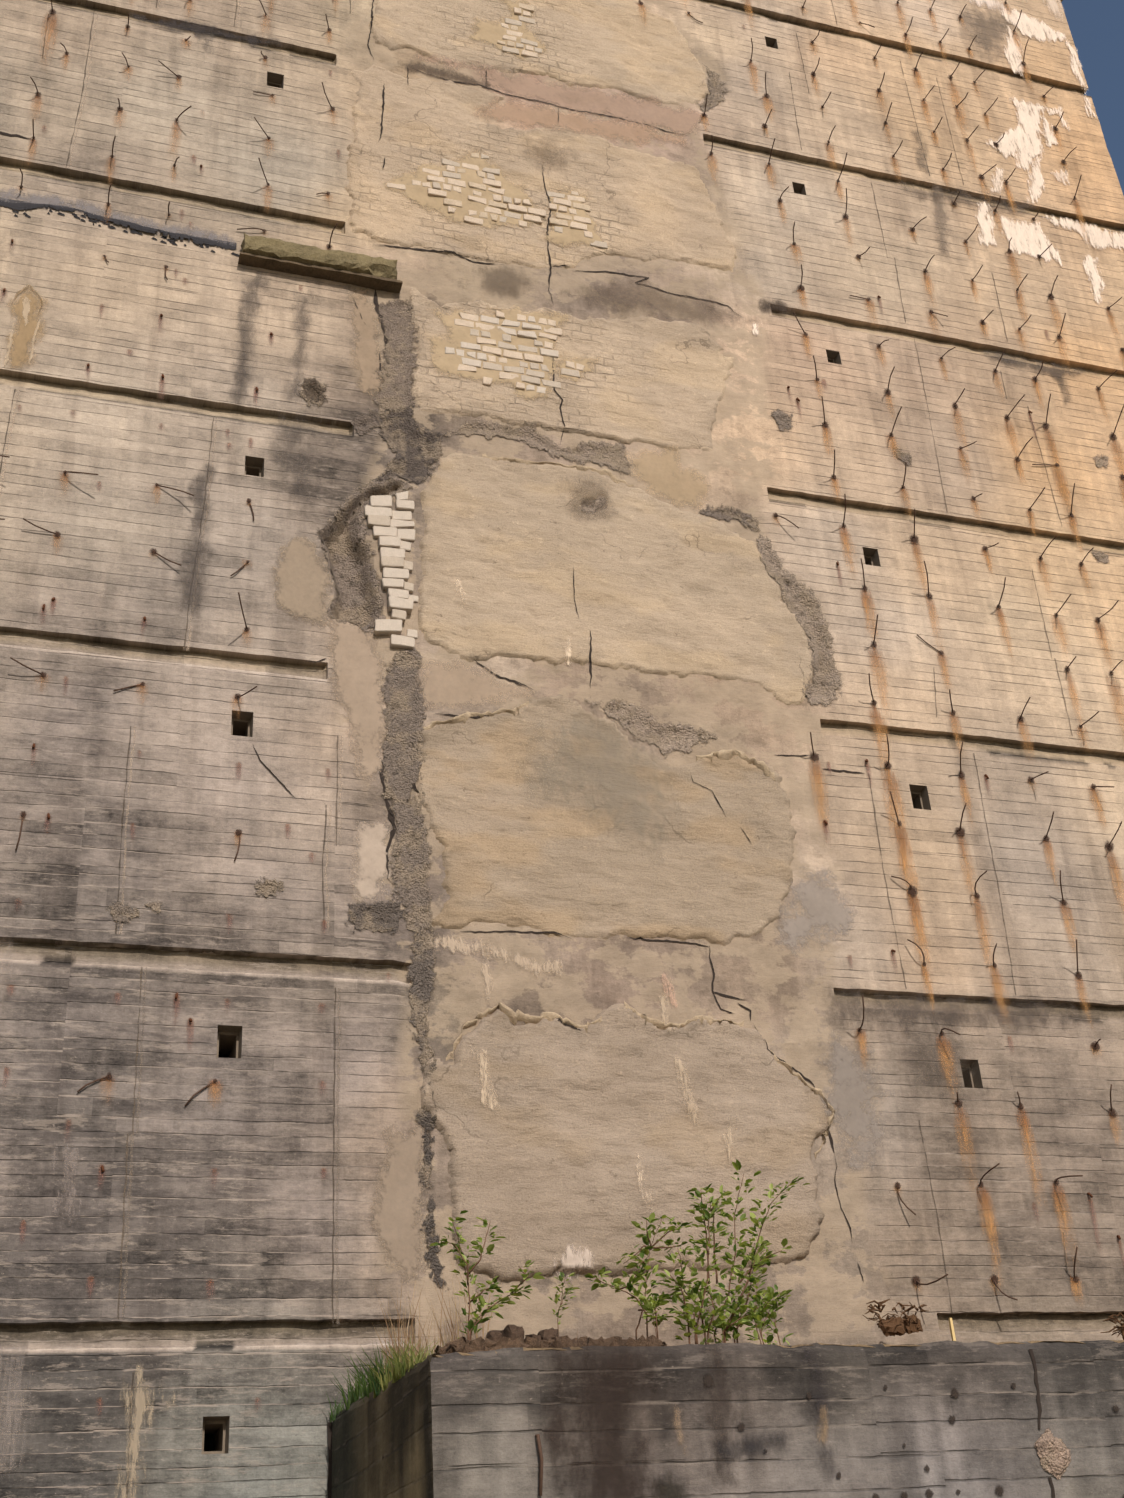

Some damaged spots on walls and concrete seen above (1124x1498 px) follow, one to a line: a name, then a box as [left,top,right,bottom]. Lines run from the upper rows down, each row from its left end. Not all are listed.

crack [367,0,687,168]
damp [970,0,1095,117]
damp [0,189,228,243]
crack [542,173,734,312]
damp [975,98,1124,303]
peeling [317,297,631,634]
spalling [699,504,843,707]
rust [836,524,849,579]
rust [810,752,830,800]
rust [871,700,881,740]
spalling [344,648,447,1288]
crack [629,937,820,1095]